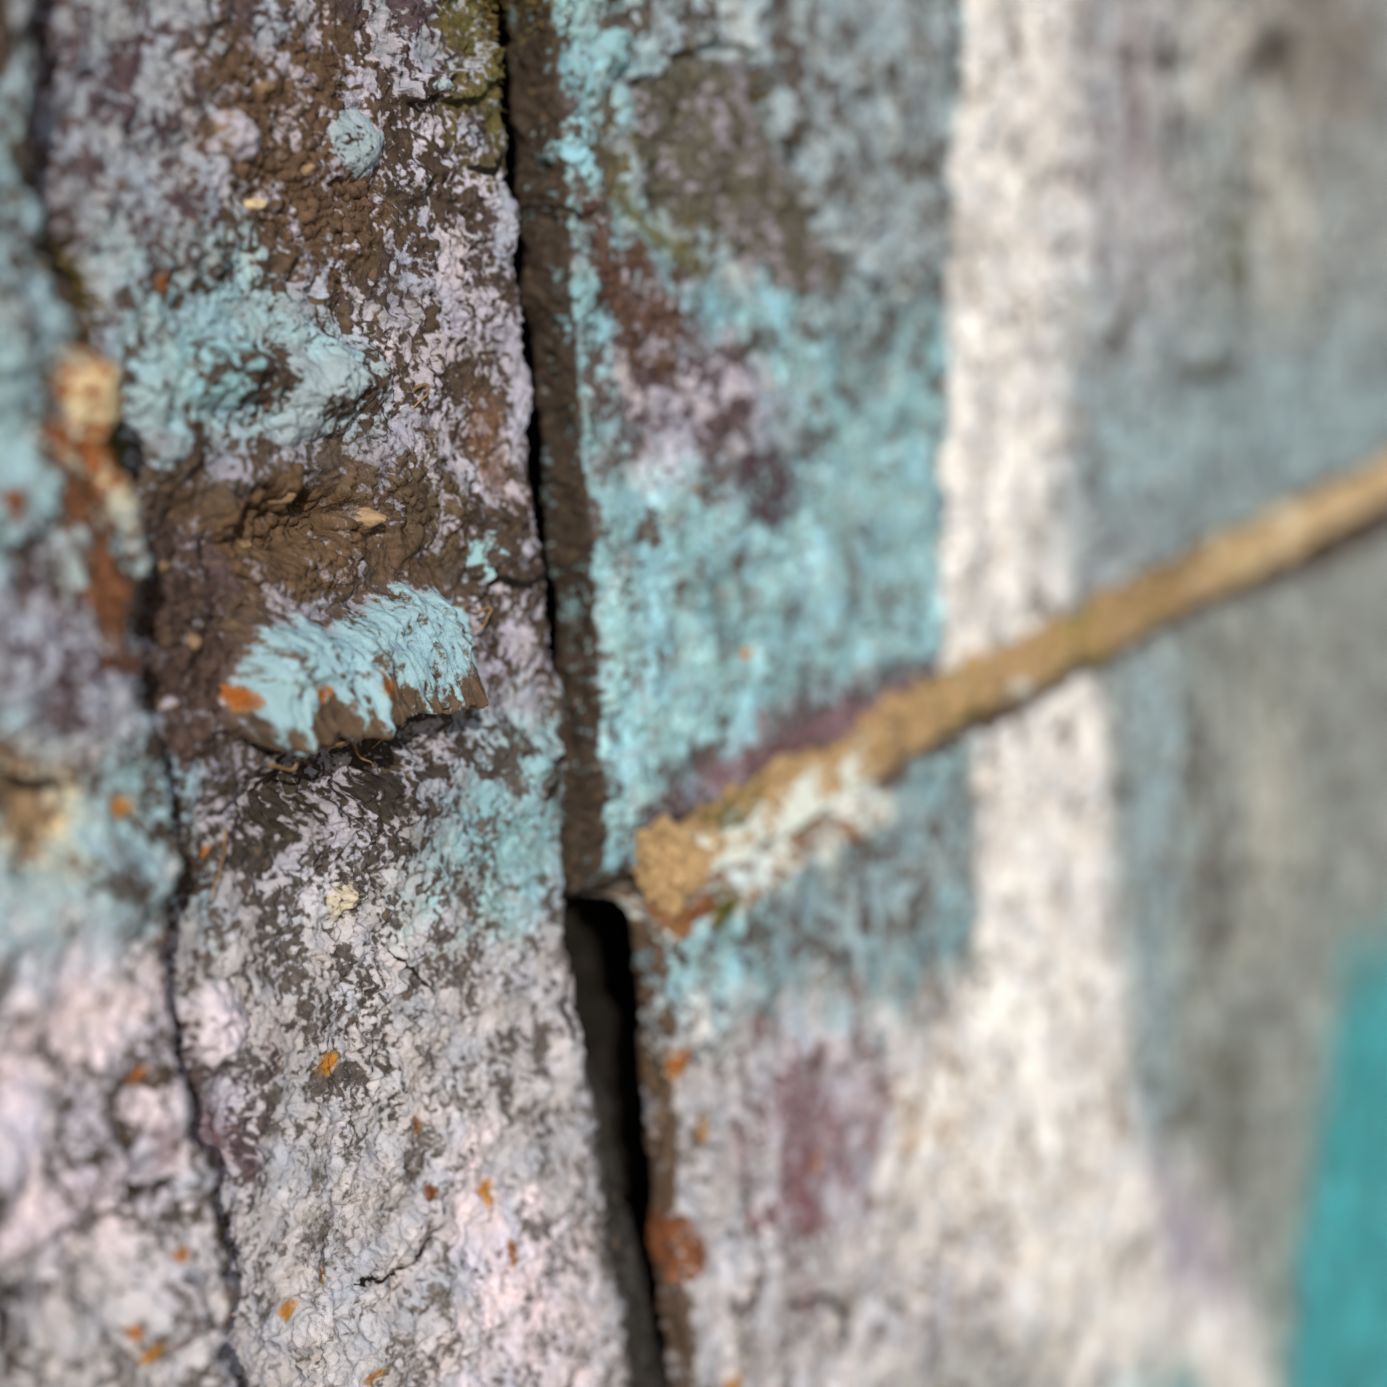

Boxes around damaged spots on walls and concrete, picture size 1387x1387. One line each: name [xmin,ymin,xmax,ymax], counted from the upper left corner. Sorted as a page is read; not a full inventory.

crack [466,150,587,222]
spalling [49,327,513,775]
crack [480,527,546,602]
crack [544,753,566,803]
crack [559,895,671,1387]